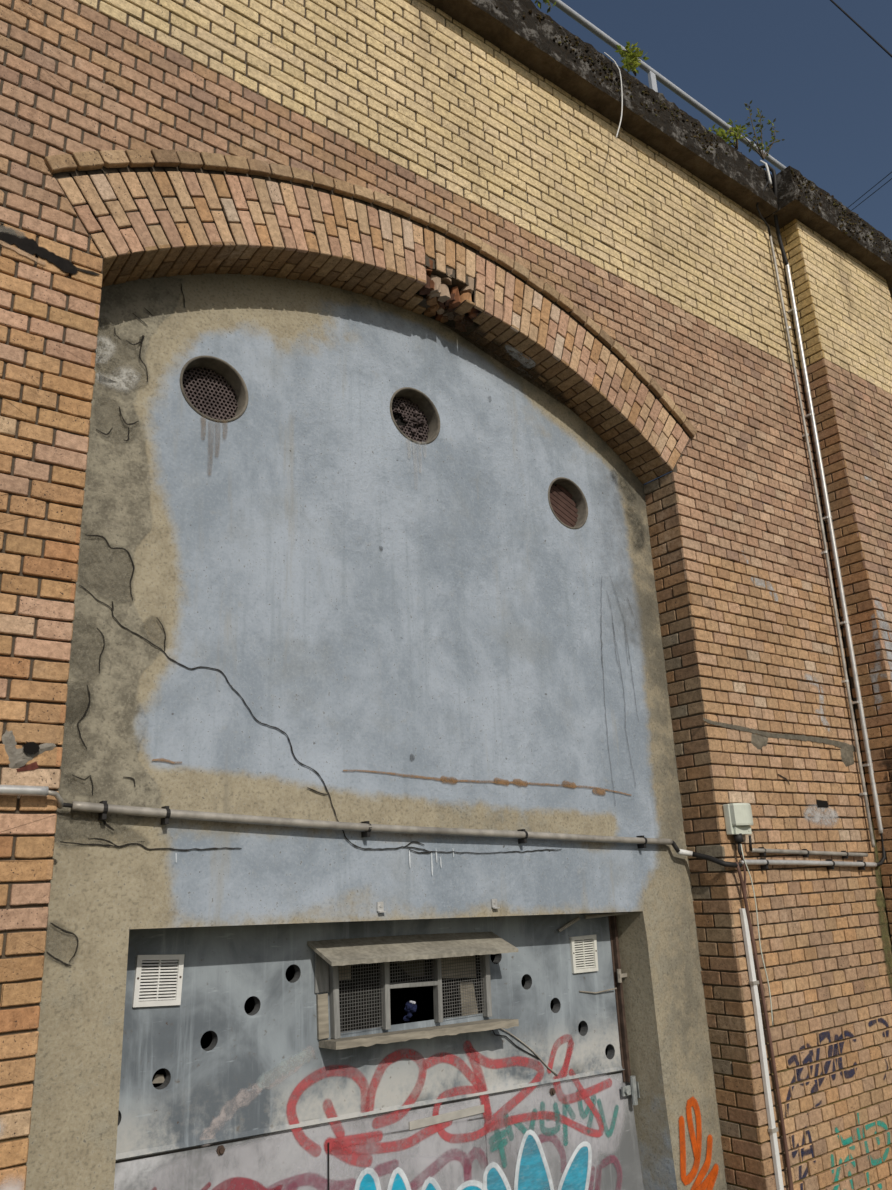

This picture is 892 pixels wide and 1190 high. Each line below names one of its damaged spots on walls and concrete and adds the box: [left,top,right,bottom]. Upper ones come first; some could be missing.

peeling [98,308,152,387]
spalling [419,259,480,331]
peeling [80,533,135,601]
peeling [63,615,105,795]
crack [60,585,562,854]
damp [870,600,892,709]
rust [343,770,631,796]
damp [870,806,892,990]